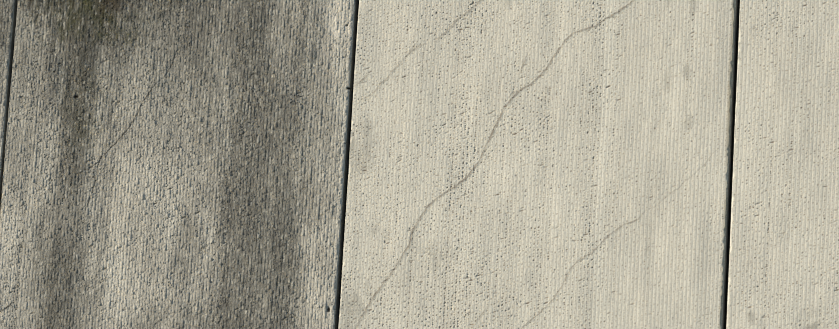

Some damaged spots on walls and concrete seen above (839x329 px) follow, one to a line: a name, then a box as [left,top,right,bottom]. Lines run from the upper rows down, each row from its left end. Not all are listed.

efflorescence [315,0,352,73]
water stain [38,156,85,329]
water stain [236,124,291,329]